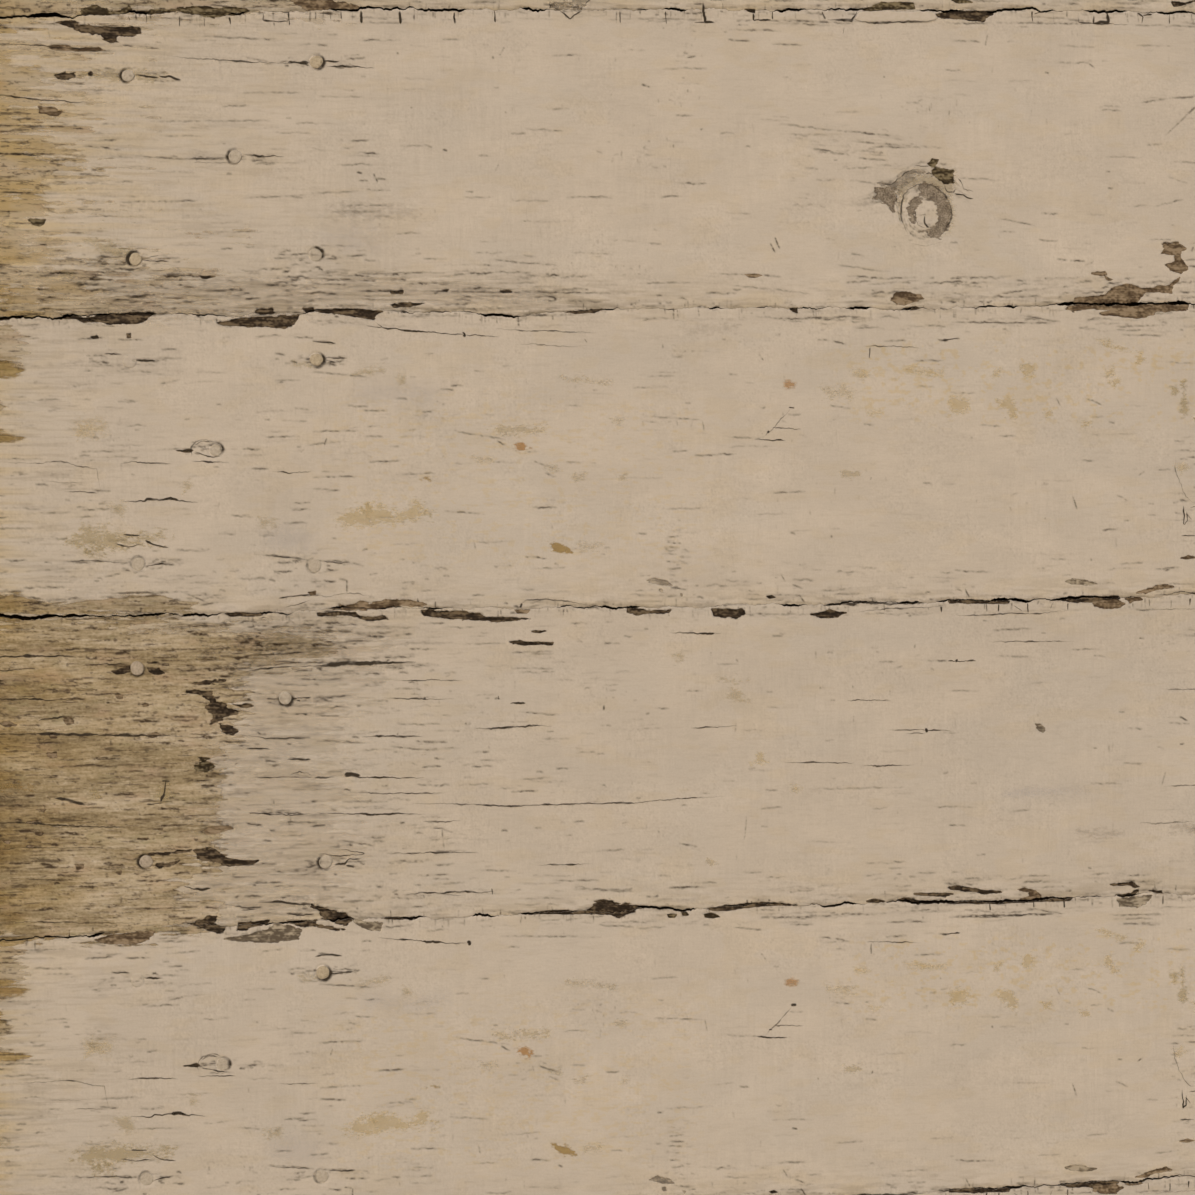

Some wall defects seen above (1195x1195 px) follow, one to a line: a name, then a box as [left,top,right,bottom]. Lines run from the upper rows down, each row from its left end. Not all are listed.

peeling [855,0,993,22]
peeling [0,0,424,379]
peeling [1066,242,1189,319]
peeling [0,429,24,443]
crack [846,601,1068,642]
peeling [0,591,554,1061]
crack [241,900,312,916]